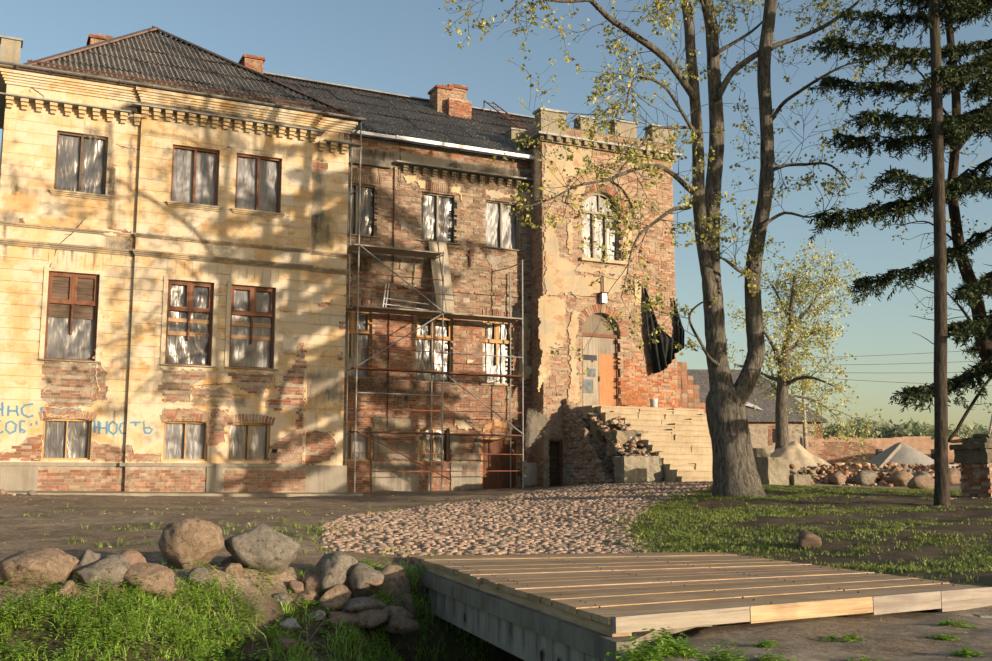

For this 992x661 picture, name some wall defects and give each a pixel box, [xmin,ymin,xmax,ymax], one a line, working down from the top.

damp [312,174,330,245]
flaking render [485,189,531,207]
flaking render [486,255,510,267]
flaking render [518,144,643,403]
spalling [41,349,108,419]
spalling [158,335,337,465]
spalling [0,434,44,461]